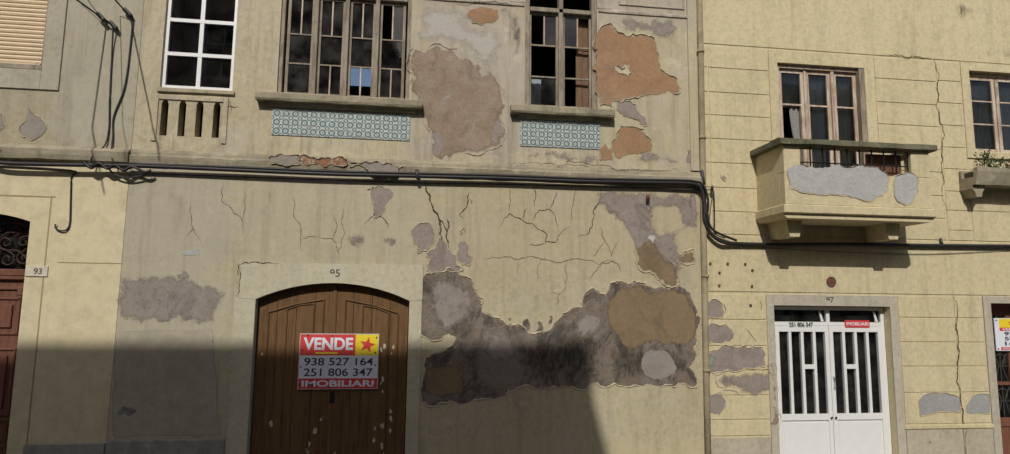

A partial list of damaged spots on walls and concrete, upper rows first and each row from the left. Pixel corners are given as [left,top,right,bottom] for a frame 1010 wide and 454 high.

peeling [592,19,676,54]
peeling [18,106,47,141]
peeling [595,90,690,163]
crack [894,54,947,209]
crack [292,197,345,253]
crack [425,181,472,247]
crack [488,161,684,303]
peeling [786,164,919,206]
peeling [117,271,224,323]
crack [237,261,278,294]
peeling [659,298,782,430]
crack [955,300,967,454]